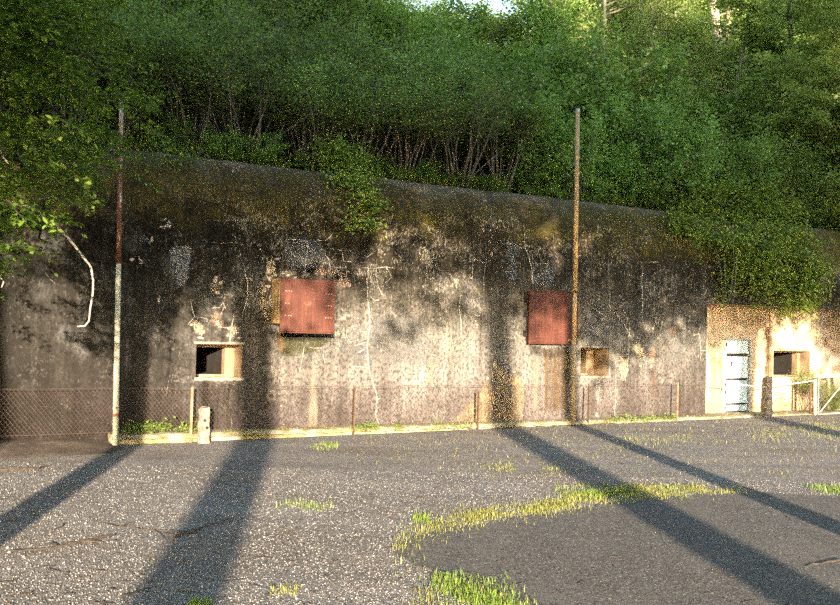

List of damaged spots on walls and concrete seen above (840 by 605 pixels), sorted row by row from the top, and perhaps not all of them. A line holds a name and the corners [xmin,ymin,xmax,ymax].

spalling [256,257,296,320]
spalling [306,267,358,288]
spalling [189,313,240,341]
crack [288,233,392,423]
corrosion [545,350,570,408]